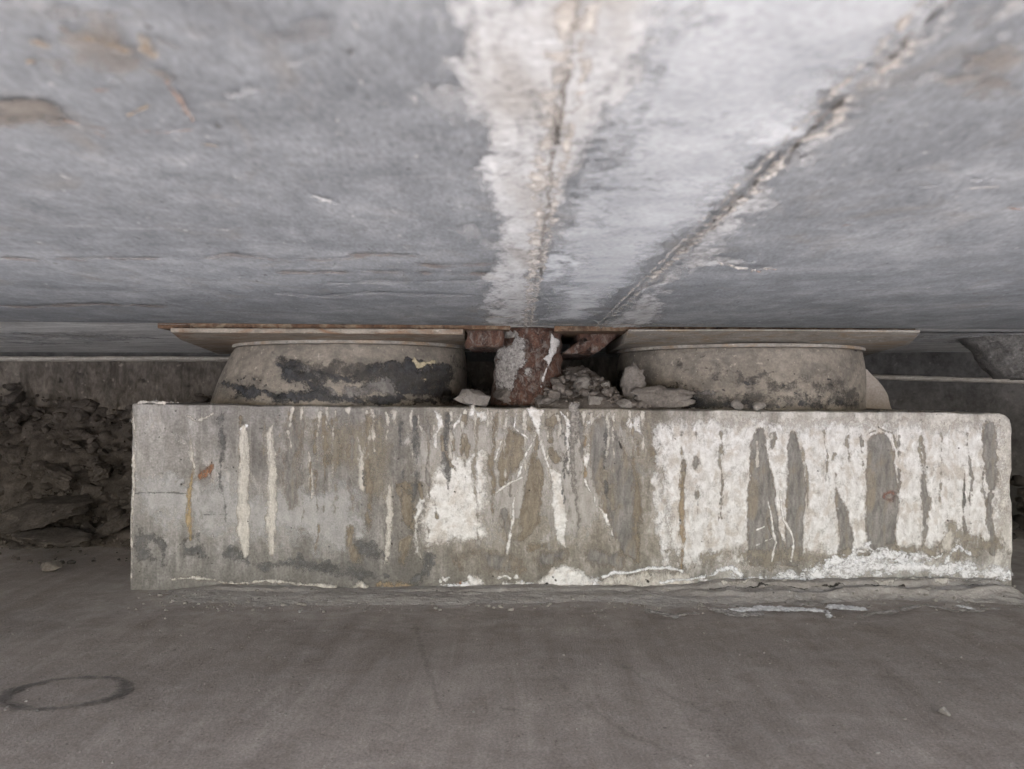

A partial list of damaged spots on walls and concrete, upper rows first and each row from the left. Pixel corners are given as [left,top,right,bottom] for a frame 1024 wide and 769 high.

crack [521,0,608,327]
leakage [422,0,949,328]
crack [595,0,954,329]
rust [185,436,214,541]
leakage [134,405,1013,588]